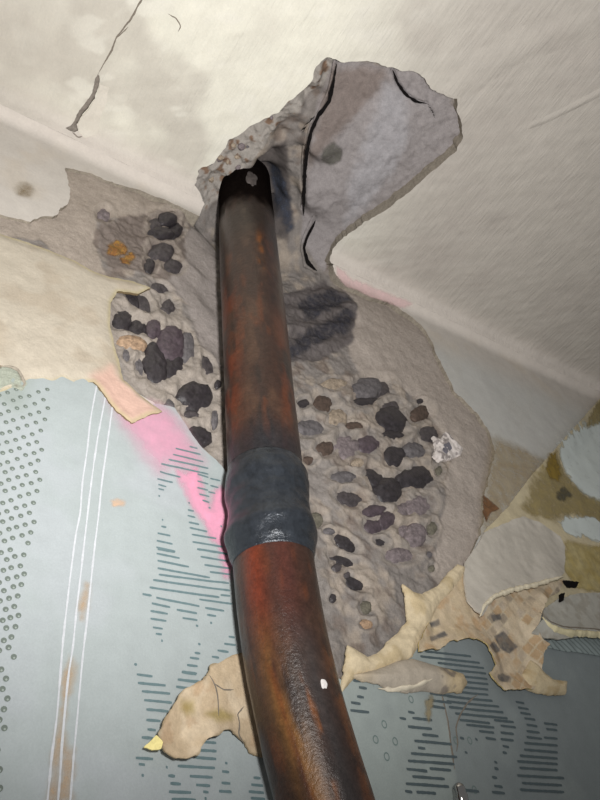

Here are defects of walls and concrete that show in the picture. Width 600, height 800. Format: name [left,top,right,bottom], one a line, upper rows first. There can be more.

crack [66,0,142,138]
crack [393,71,435,116]
crack [301,64,337,271]
water stain [322,143,342,164]
rust [107,240,135,264]
water stain [289,290,352,356]
spalling [0,57,492,679]